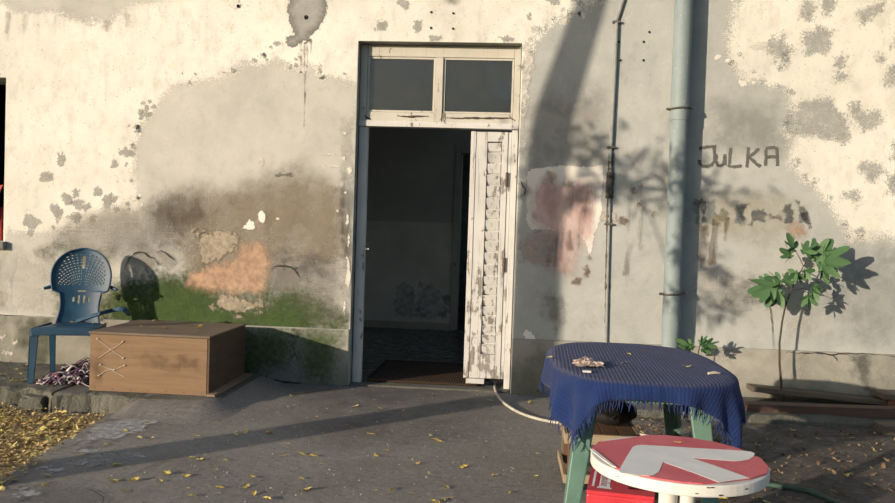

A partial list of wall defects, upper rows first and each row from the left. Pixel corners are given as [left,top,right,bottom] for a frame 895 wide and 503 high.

crack [125,250,177,269]
peeling [0,0,356,329]
damp [157,181,348,280]
peeling [498,0,675,345]
peeling [679,0,895,354]